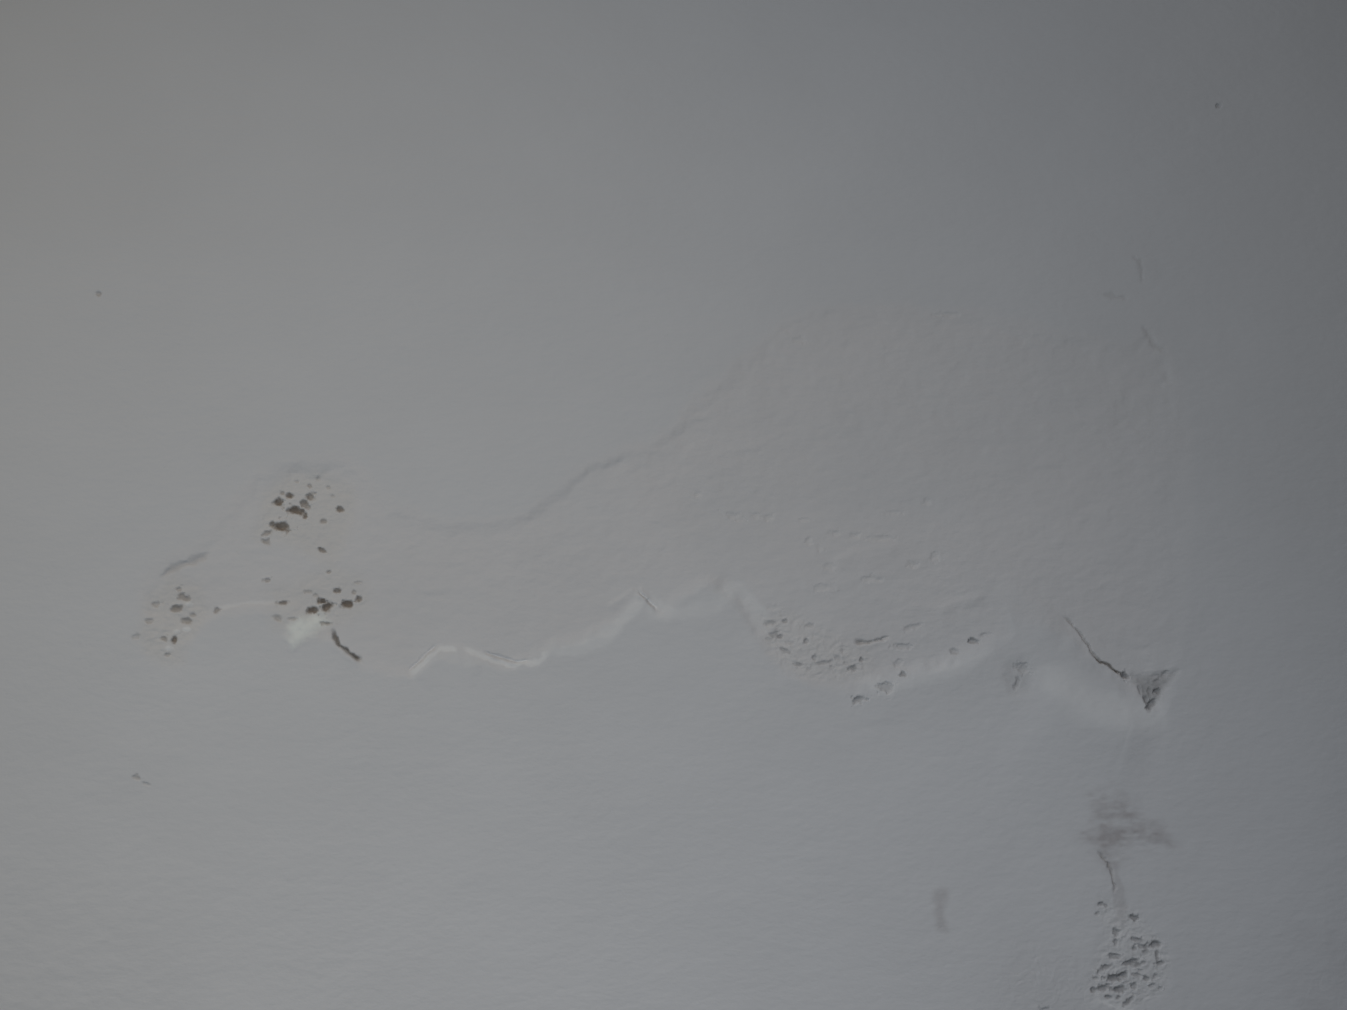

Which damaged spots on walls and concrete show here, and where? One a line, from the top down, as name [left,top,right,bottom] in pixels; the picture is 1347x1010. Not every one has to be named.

crack [1045,596,1145,691]